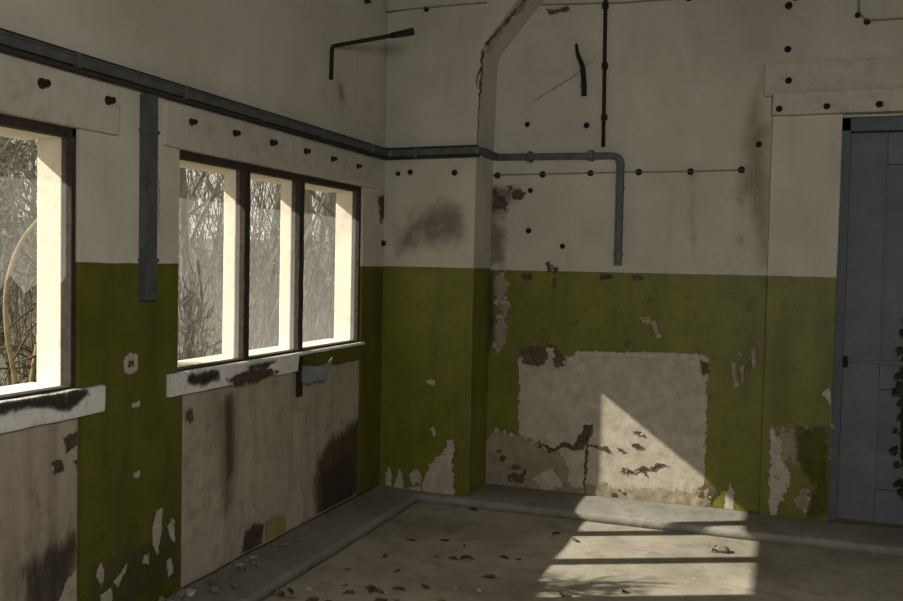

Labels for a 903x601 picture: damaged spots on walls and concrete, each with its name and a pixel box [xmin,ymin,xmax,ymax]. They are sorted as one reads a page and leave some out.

spalling [492,186,526,210]
peeling [488,270,511,354]
flaking render [485,344,735,510]
leakage [315,421,358,514]
peeling [385,439,455,495]
spalling [768,422,835,515]
leakage [27,534,77,601]
peeling [59,569,77,601]
peeling [96,563,128,601]
peeling [142,508,175,578]